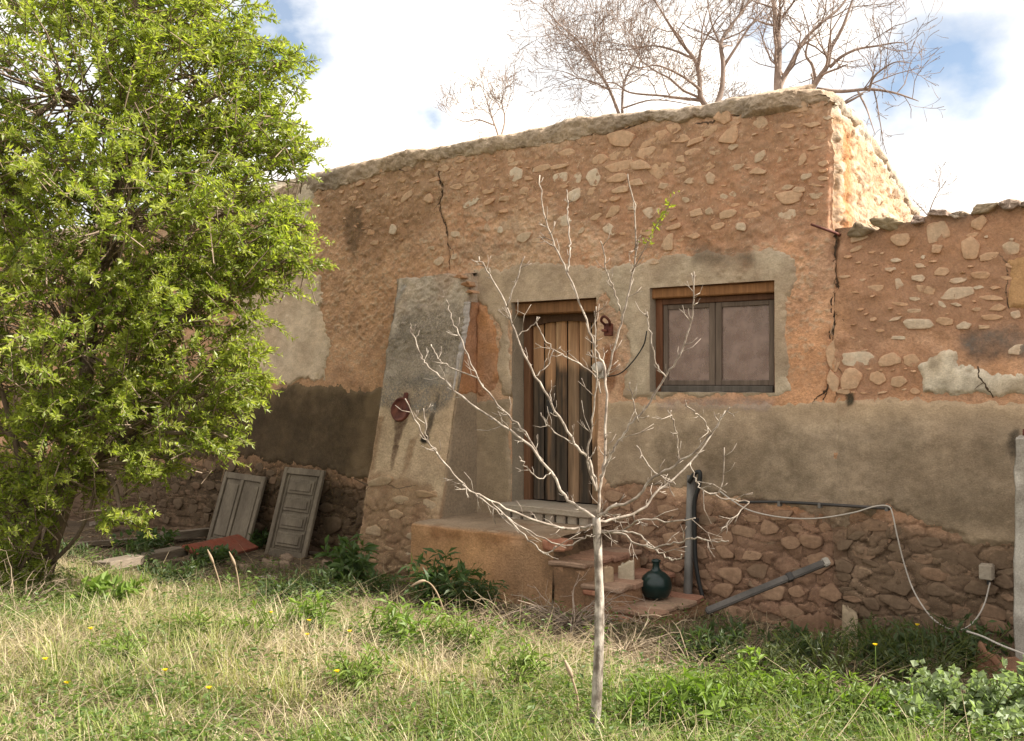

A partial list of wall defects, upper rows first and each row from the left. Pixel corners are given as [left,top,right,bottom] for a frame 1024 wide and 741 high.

crack [438,171,454,264]
flaking render [453,274,499,397]
crack [829,230,845,342]
crack [975,366,994,398]
spalling [102,456,284,535]
spalling [604,485,1015,652]